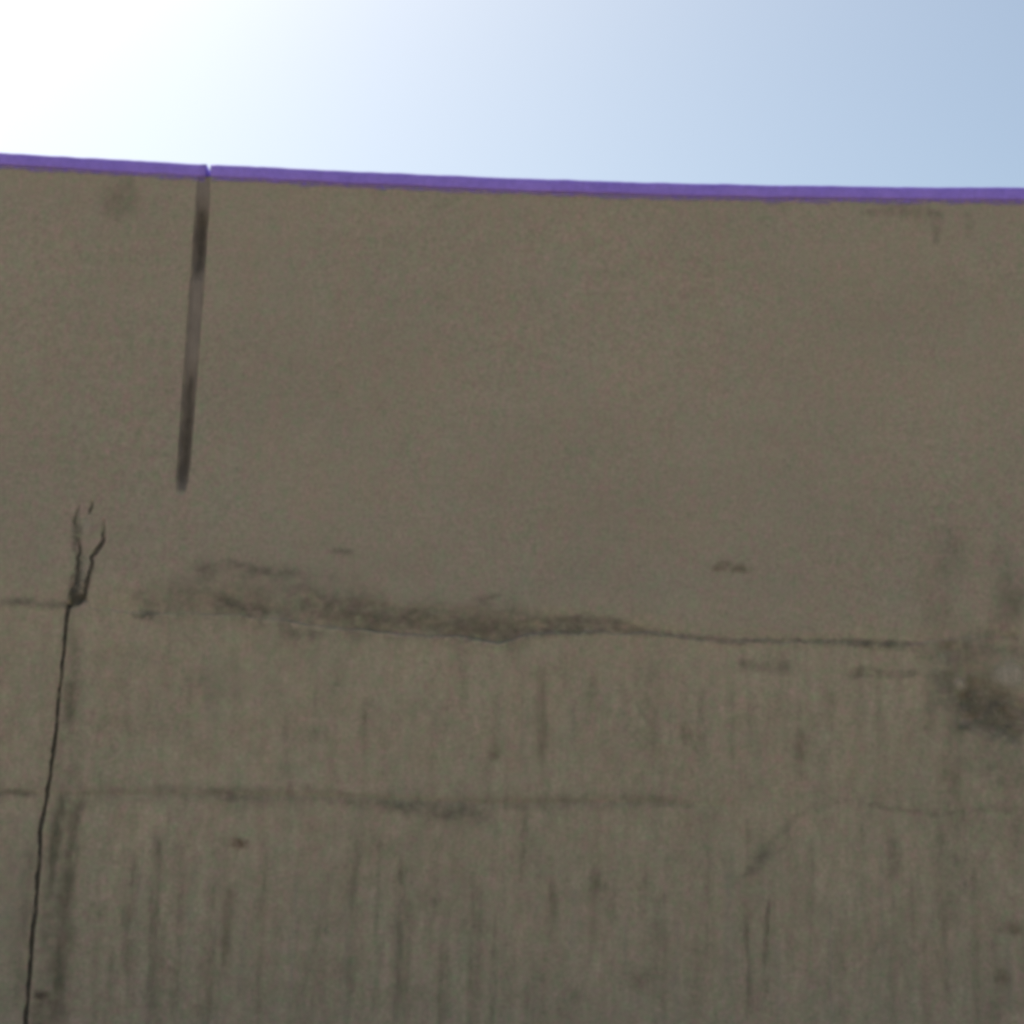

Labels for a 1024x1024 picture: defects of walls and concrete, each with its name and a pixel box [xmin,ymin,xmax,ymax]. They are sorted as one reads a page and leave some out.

crack [23,503,105,1024]